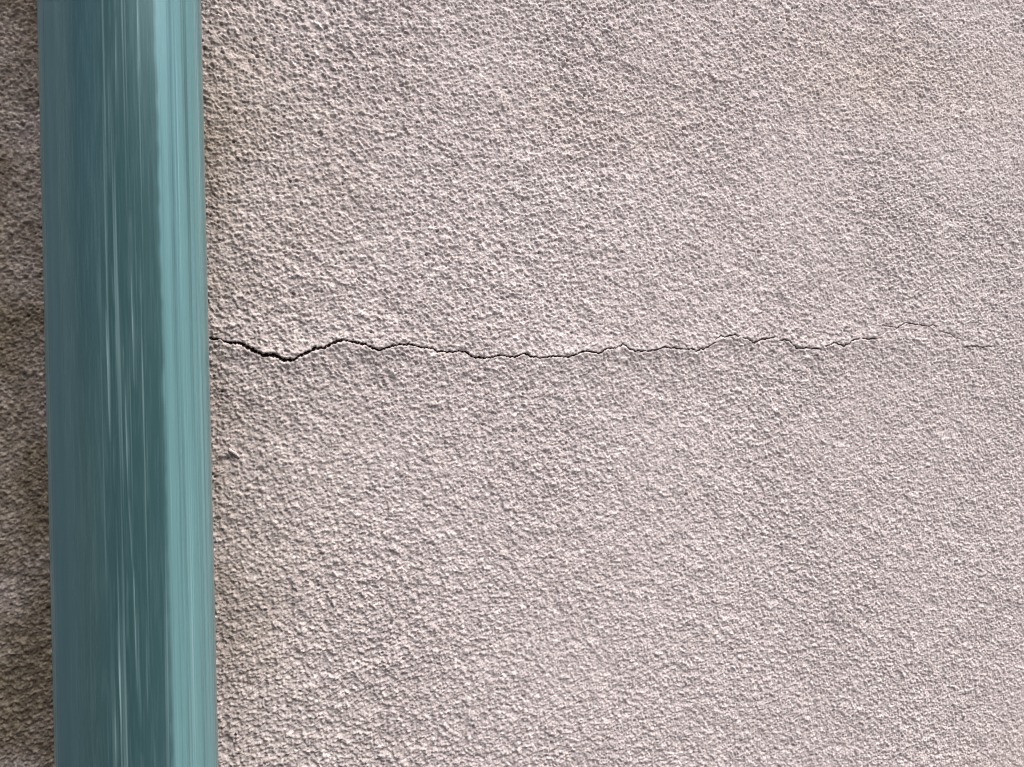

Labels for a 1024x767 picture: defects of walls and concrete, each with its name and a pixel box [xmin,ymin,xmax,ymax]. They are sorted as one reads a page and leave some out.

crack [209,322,991,362]